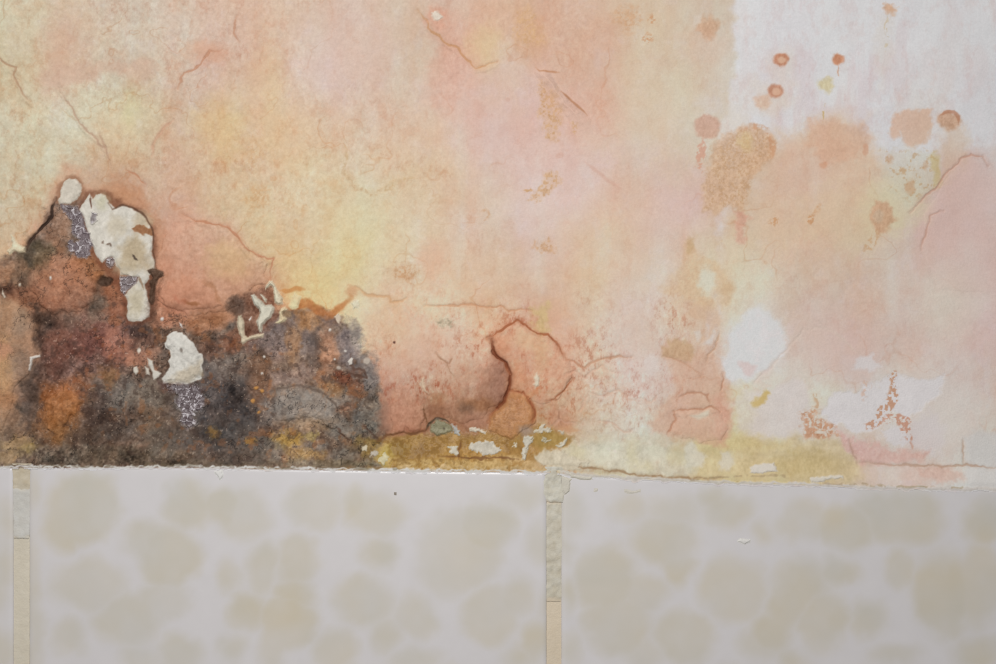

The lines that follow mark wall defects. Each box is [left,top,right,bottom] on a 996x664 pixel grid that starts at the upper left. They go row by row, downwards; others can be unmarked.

crack [414,6,501,73]
corrosion [692,42,978,253]
spalling [53,173,205,382]
crack [176,209,278,282]
peeling [222,279,302,346]
crack [268,383,429,444]
crack [344,351,369,380]
crack [437,439,521,462]
leakage [0,0,969,486]
crack [351,284,635,425]
crack [665,329,726,437]
crack [905,148,995,252]